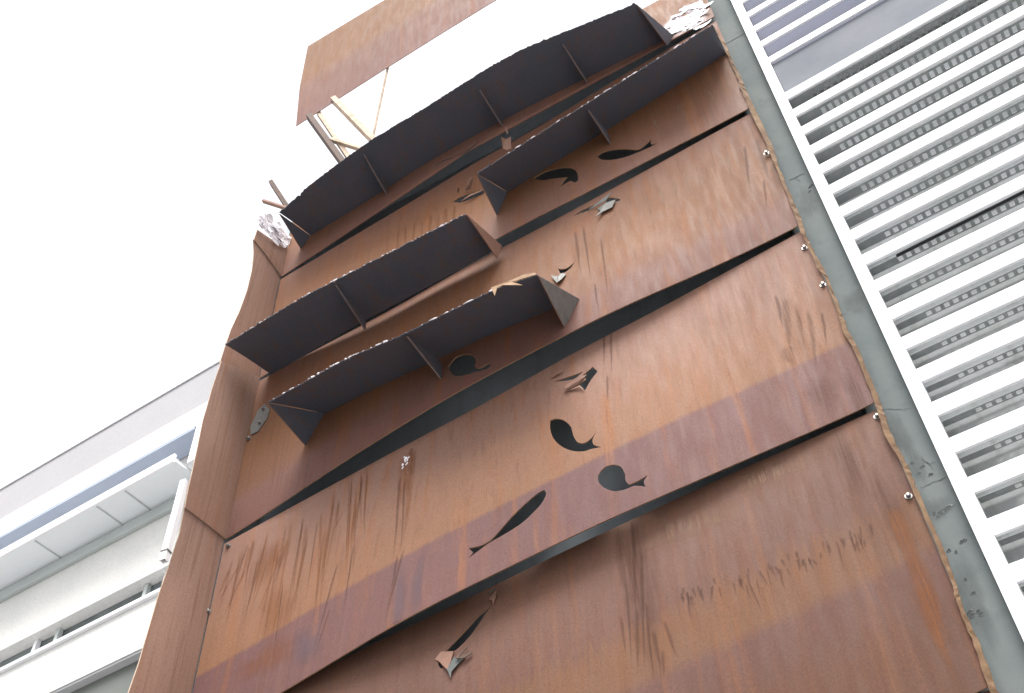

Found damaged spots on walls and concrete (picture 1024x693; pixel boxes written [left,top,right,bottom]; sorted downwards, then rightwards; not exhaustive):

peeling [665,0,714,49]
peeling [257,212,292,248]